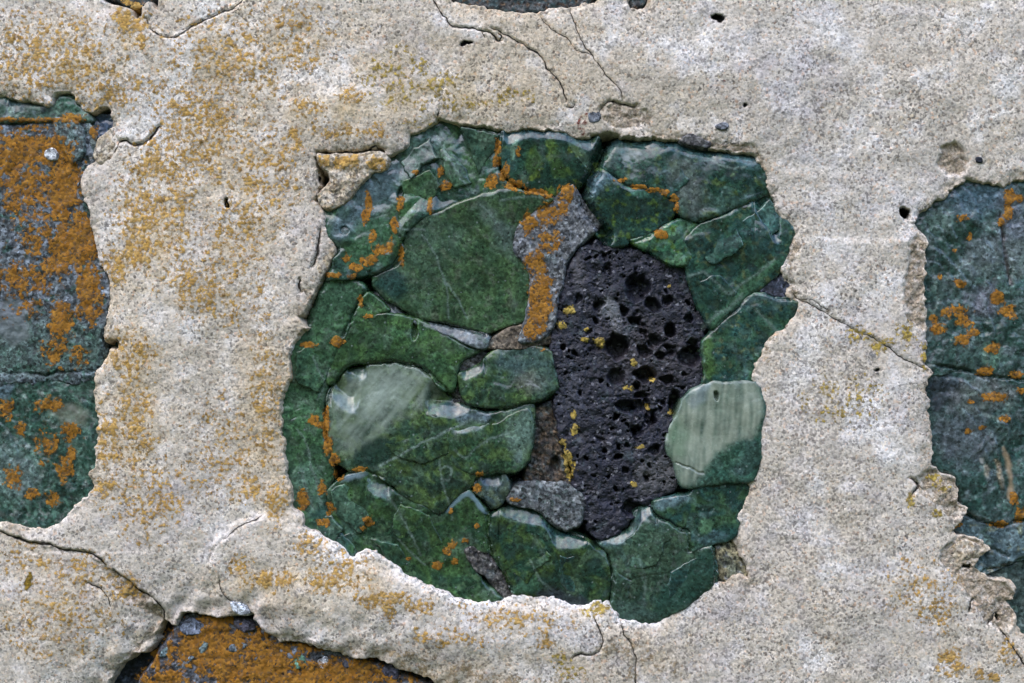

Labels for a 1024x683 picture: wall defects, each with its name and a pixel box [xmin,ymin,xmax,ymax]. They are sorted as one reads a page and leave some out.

crack [433,0,575,108]
crack [541,12,636,112]
peeling [93,113,113,138]
spalling [677,122,762,163]
spalling [905,236,926,328]
peeling [506,477,586,532]
spalling [917,469,963,516]
crack [0,531,165,618]
peeling [713,541,748,582]
spalling [941,536,1014,628]